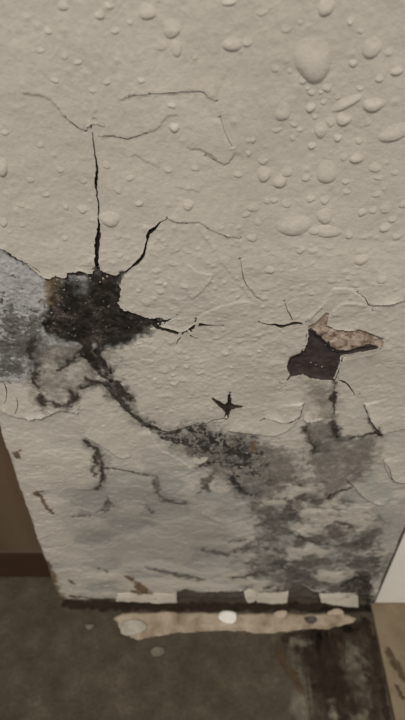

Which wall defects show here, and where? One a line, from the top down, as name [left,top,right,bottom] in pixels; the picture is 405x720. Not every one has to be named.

crack [125,88,234,167]
crack [65,116,146,270]
crack [122,216,186,274]
crack [207,228,240,241]
peeling [0,243,194,384]
crack [154,318,222,345]
spalling [287,313,387,381]
crack [104,387,243,433]
damp [26,271,385,600]
peeling [120,619,147,636]
peeling [116,584,358,619]